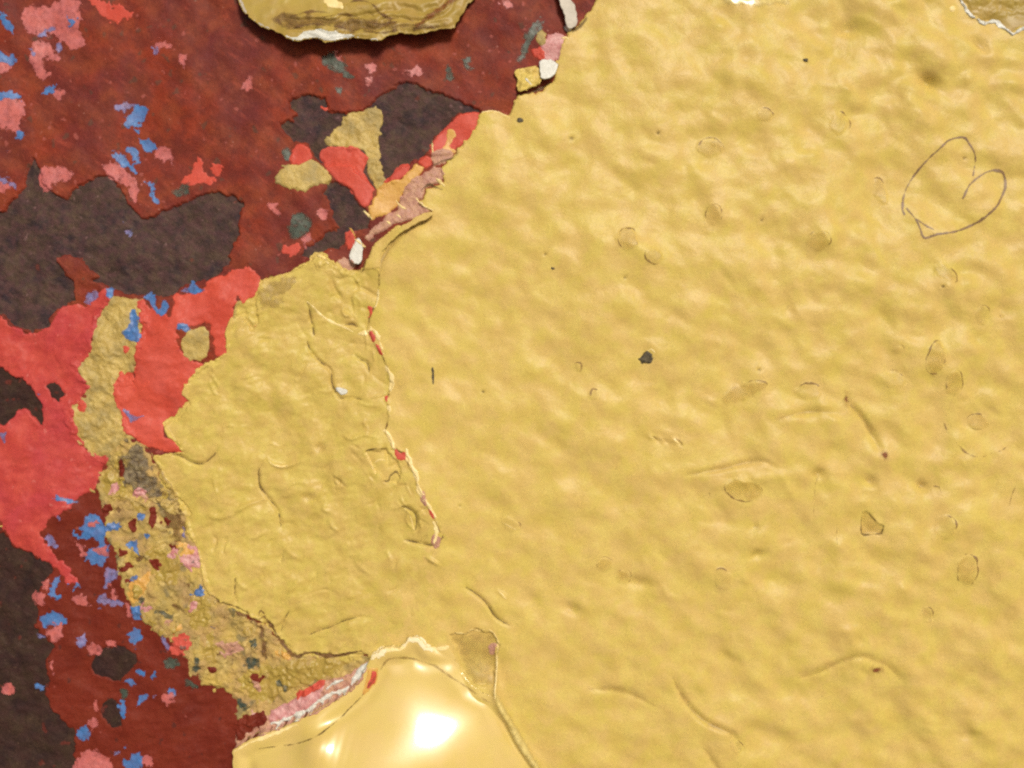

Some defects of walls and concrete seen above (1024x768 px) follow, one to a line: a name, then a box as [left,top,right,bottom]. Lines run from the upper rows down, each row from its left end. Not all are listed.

peeling [0,0,596,768]